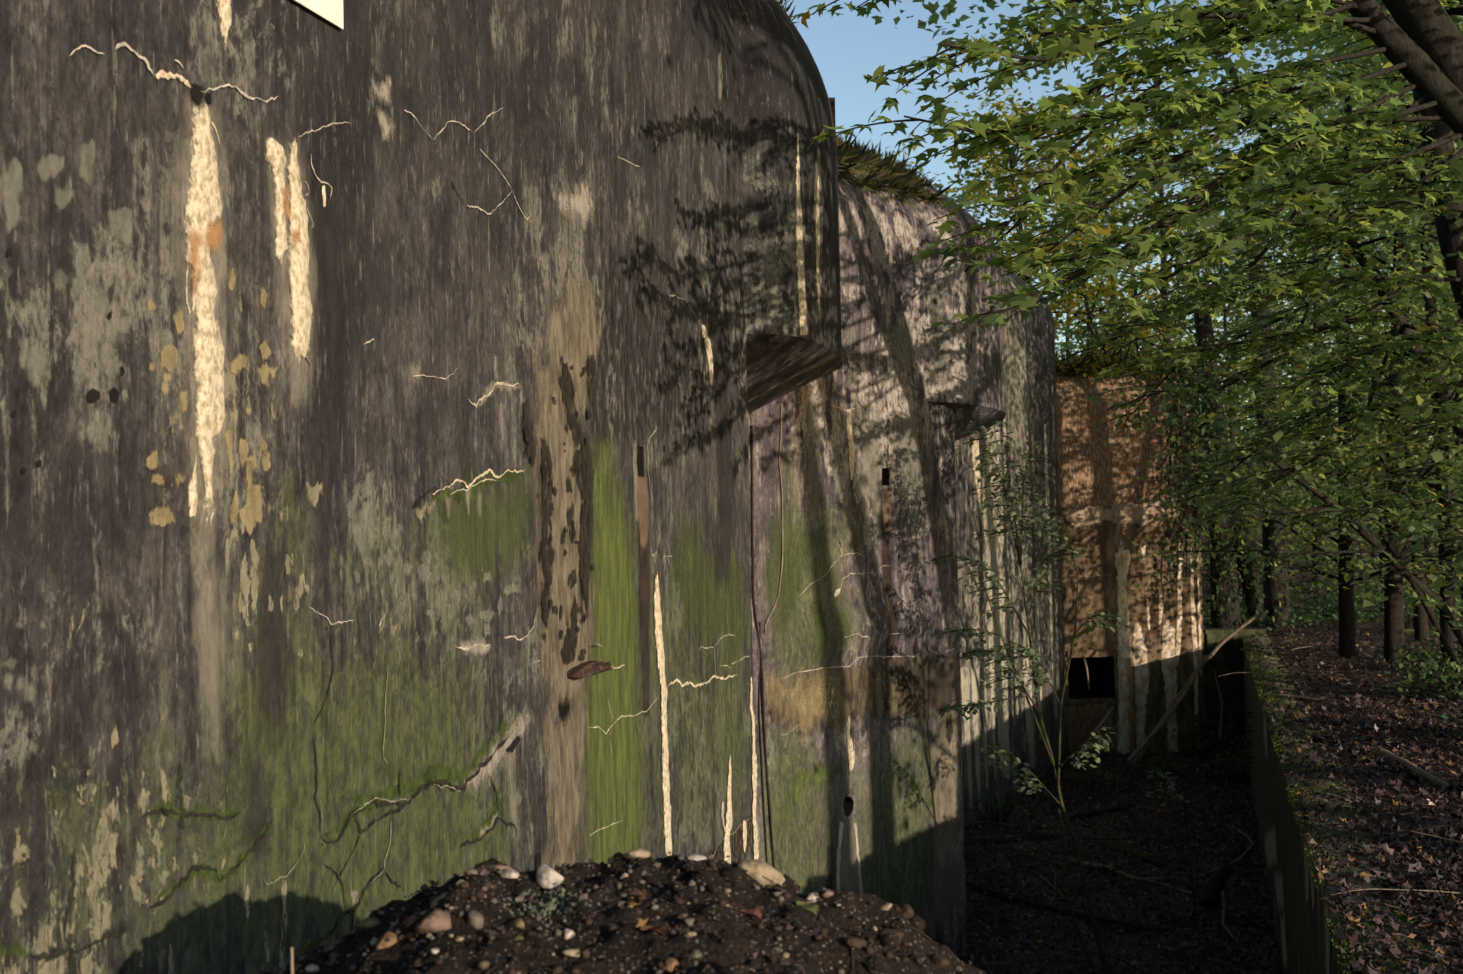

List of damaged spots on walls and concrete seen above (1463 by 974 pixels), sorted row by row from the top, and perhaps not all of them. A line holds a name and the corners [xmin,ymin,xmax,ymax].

crack [70,42,278,103]
crack [405,107,592,220]
crack [413,469,524,521]
crack [0,607,521,974]
leakage [258,563,283,716]
leakage [467,714,529,788]
rust [638,473,653,715]
efflorescence [651,550,673,856]
crack [587,614,749,752]
leakage [721,674,855,864]
leakage [827,821,863,893]